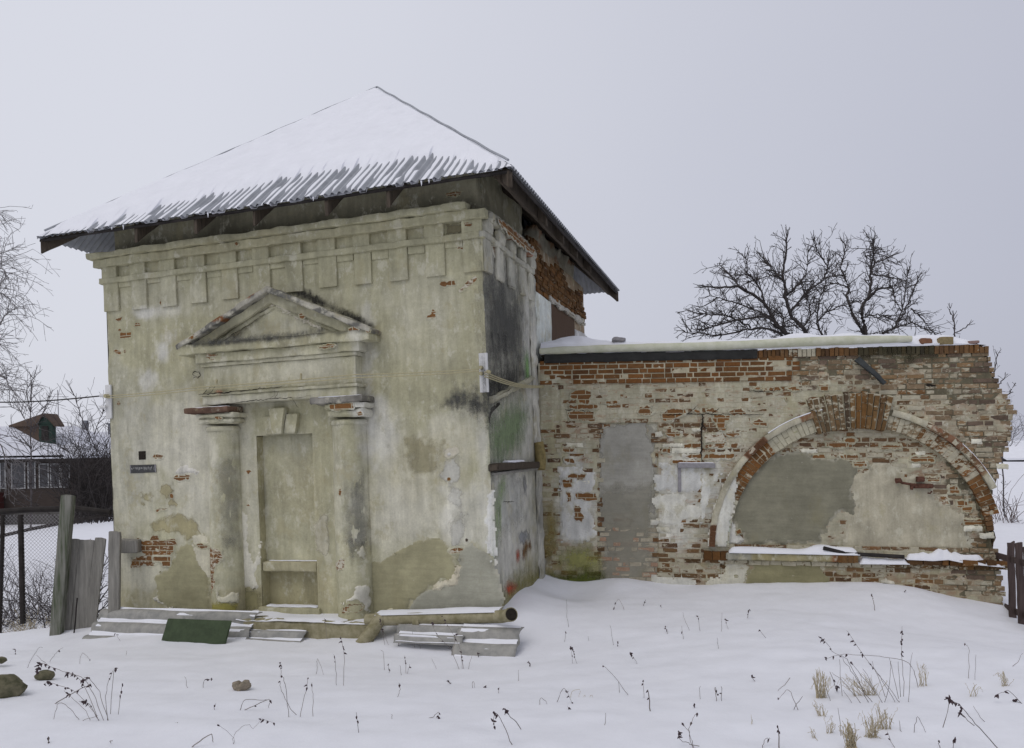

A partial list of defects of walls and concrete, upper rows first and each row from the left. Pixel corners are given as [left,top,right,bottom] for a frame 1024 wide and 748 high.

flaking render [130,465,262,604]
peeling [557,446,600,543]
peeling [637,404,769,547]
crack [668,390,780,462]
peeling [651,440,1008,585]